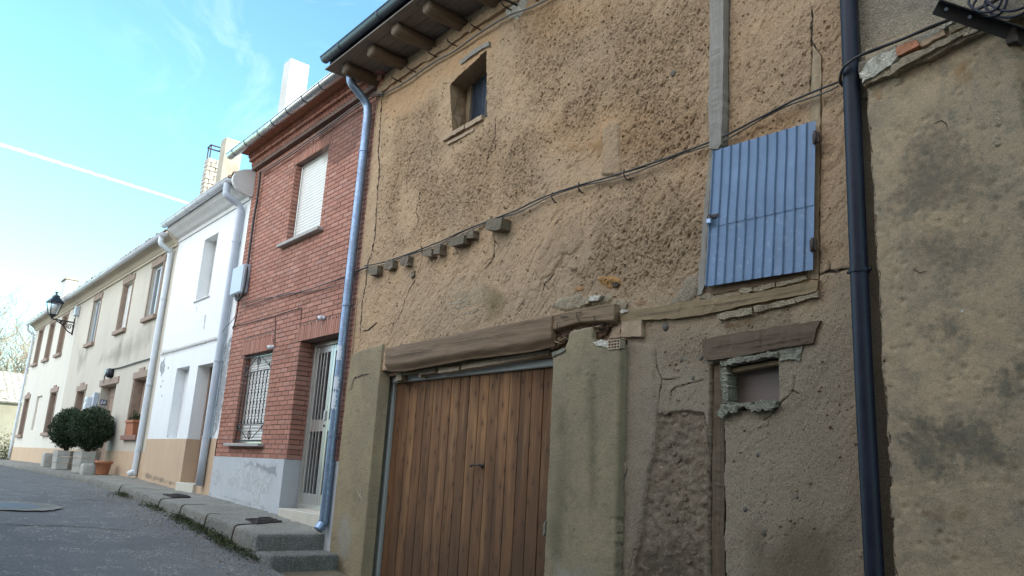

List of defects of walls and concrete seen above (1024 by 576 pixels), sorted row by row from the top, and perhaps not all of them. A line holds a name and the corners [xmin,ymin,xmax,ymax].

crack [808,11,816,86]
crack [360,97,423,331]
peeling [549,276,622,312]
crack [656,353,702,404]
spalling [632,410,713,576]